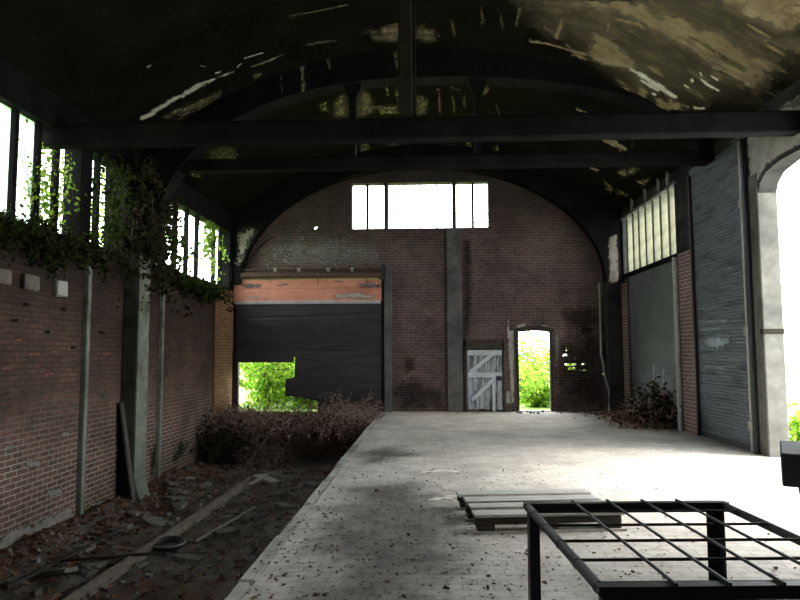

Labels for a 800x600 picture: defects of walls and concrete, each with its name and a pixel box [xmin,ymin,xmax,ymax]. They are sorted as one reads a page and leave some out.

flaking render [369,27,399,41]
flaking render [416,27,435,41]
flaking render [515,0,800,110]
flaking render [170,96,218,116]
flaking render [319,87,399,116]
flaking render [416,95,428,115]
damp [561,309,600,398]